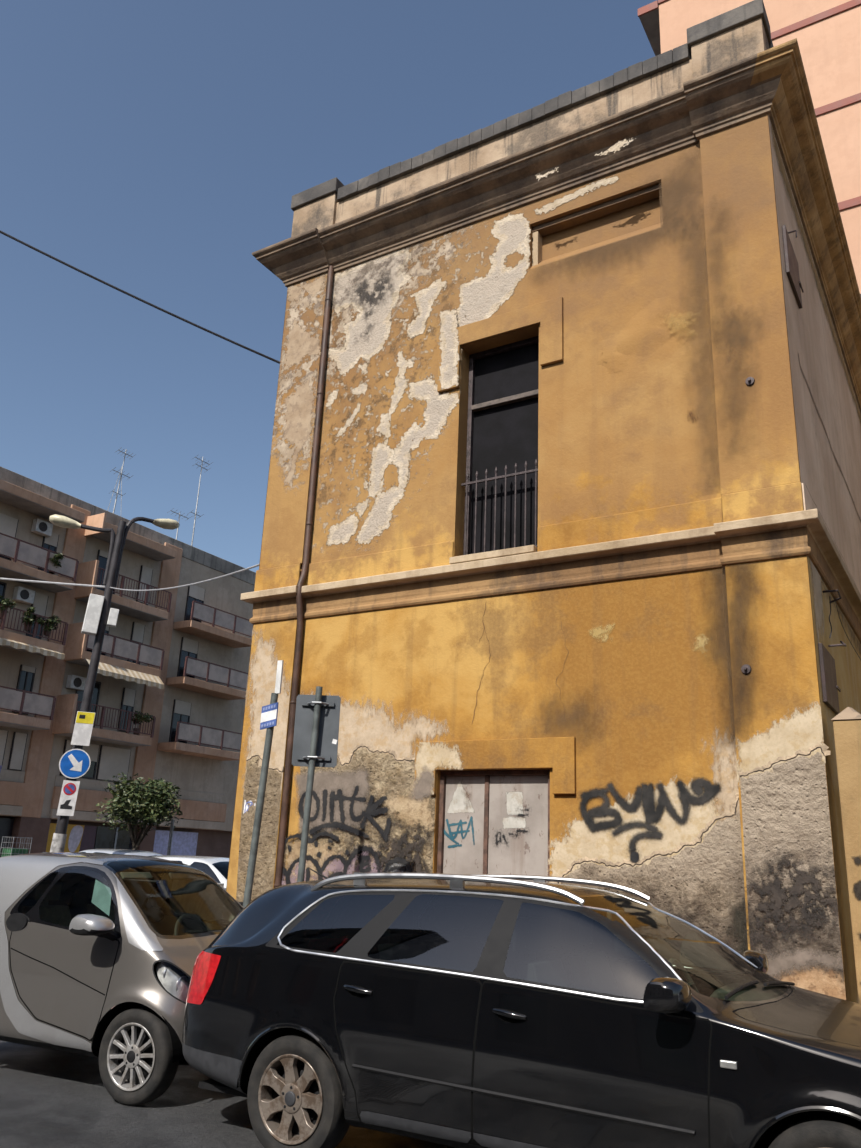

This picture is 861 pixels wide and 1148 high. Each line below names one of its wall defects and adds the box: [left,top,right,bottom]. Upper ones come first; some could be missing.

peeling [271,175,619,547]
peeling [242,629,313,792]
spalling [285,840,343,882]
peeling [337,700,463,831]
peeling [547,703,826,884]
leakage [710,564,752,737]
leakage [732,855,839,956]
spalling [773,967,846,1000]